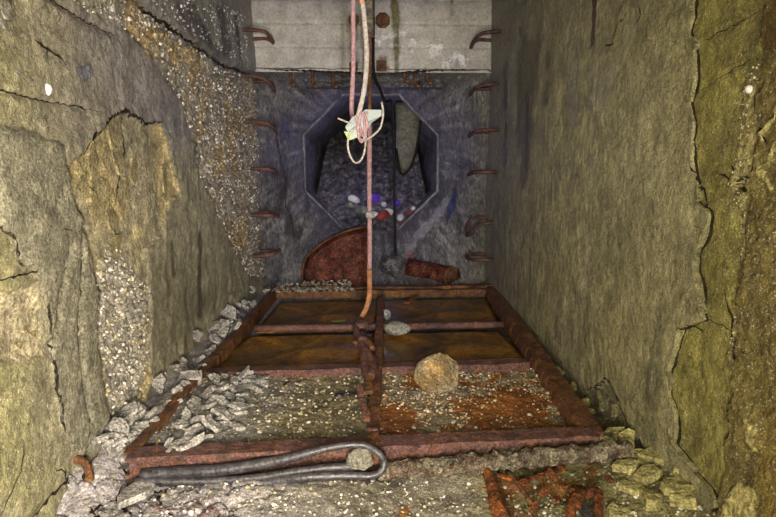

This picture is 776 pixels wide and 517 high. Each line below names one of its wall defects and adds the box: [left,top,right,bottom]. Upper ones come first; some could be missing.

crack [0,89,101,112]
crack [0,228,98,517]
crack [88,462,132,517]
crack [154,486,174,517]